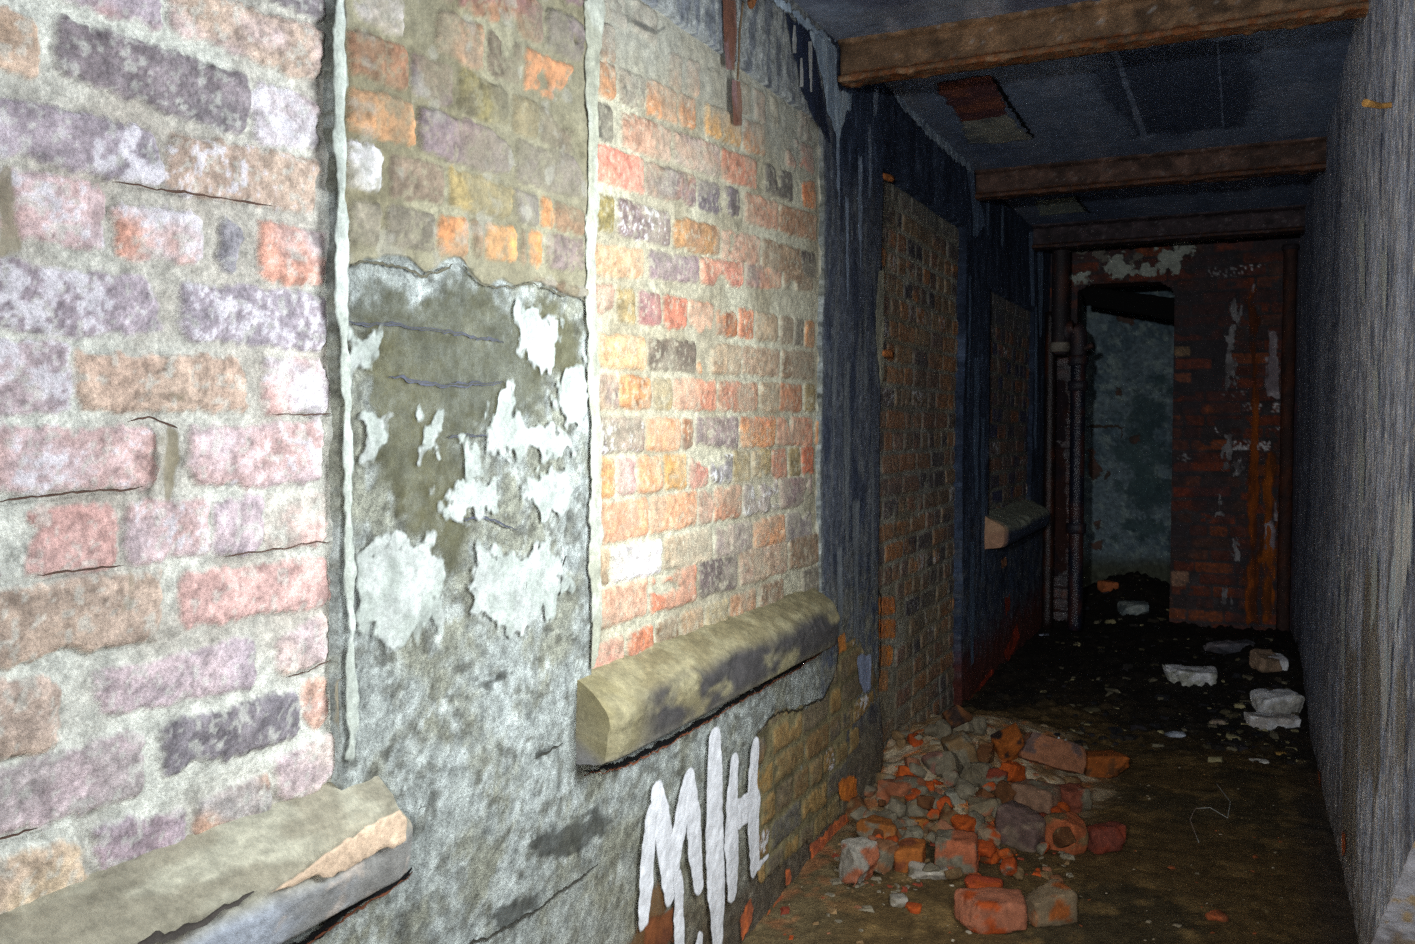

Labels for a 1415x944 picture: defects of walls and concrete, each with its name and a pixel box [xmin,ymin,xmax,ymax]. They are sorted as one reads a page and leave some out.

peeling [1069,239,1215,285]
damp [364,273,581,573]
corrosion [1243,287,1278,625]
spalling [757,269,1026,889]
spalling [1097,580,1119,592]
crack [584,643,837,776]
spalling [276,810,407,890]
spalling [1036,801,1126,856]
spalling [138,891,254,944]
crack [292,867,413,944]
crack [469,864,598,944]